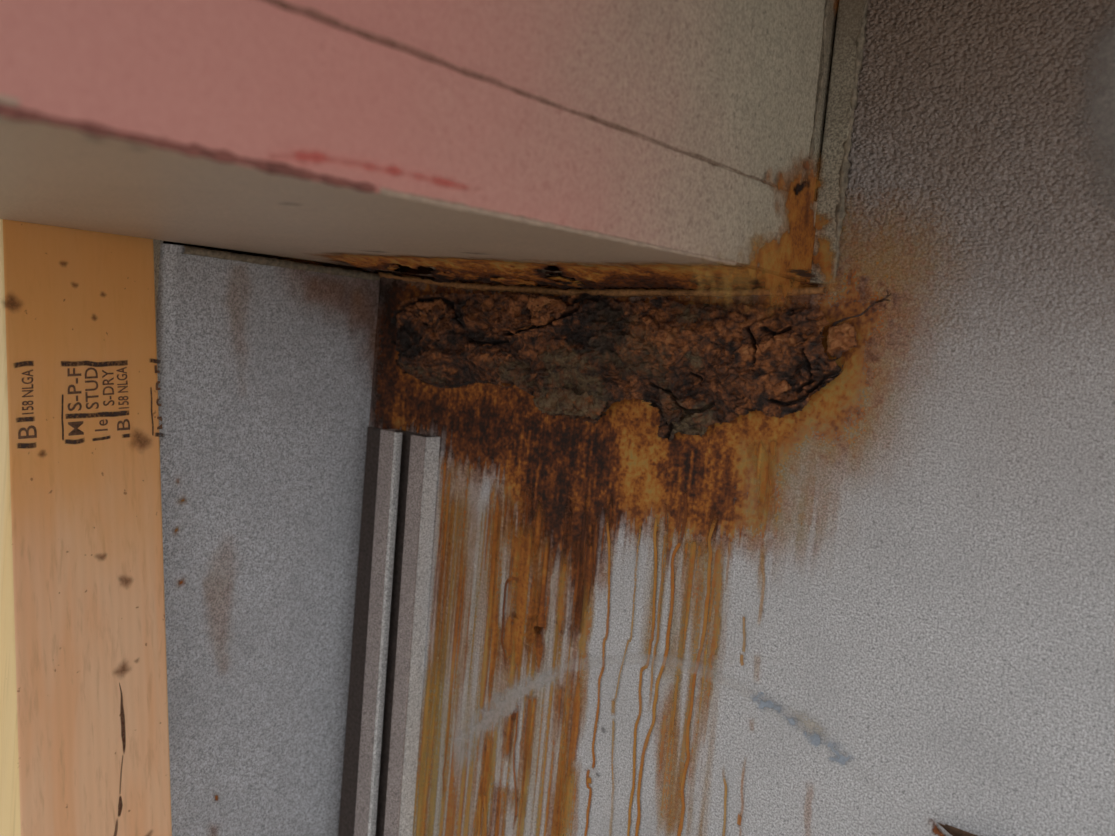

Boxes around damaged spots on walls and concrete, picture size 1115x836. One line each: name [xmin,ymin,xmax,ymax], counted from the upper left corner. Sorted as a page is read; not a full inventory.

peeling [503,295,567,334]
peeling [826,322,857,358]
corrosion [316,160,915,836]